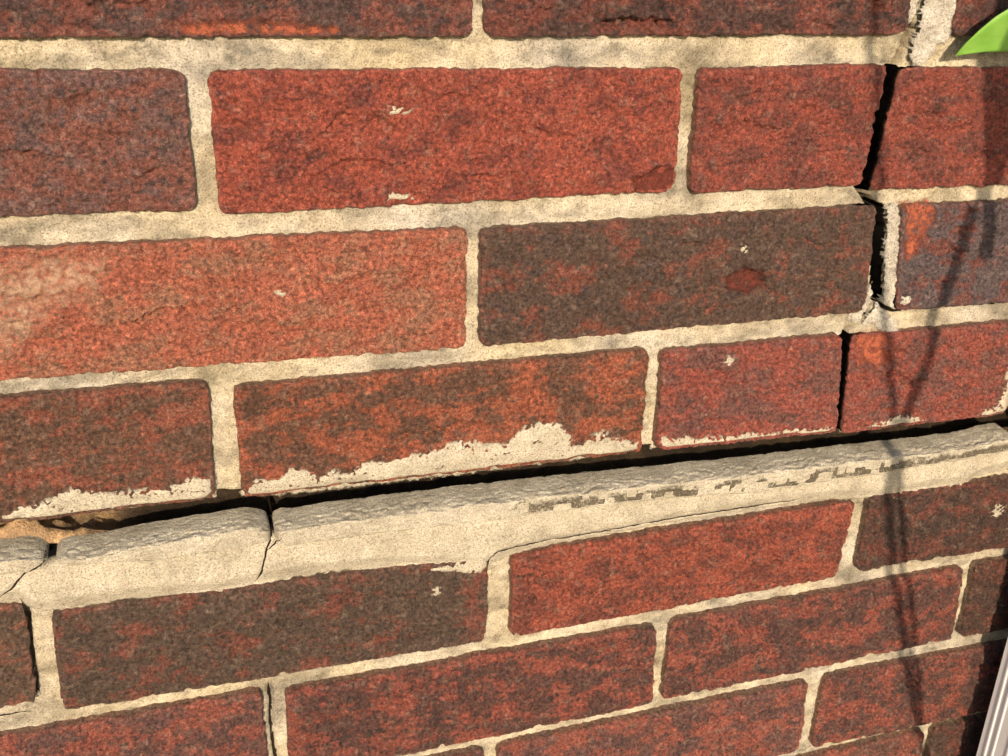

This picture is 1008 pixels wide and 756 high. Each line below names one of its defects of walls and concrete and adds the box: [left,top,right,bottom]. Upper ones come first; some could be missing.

crack [857,192,920,315]
crack [0,409,1008,716]